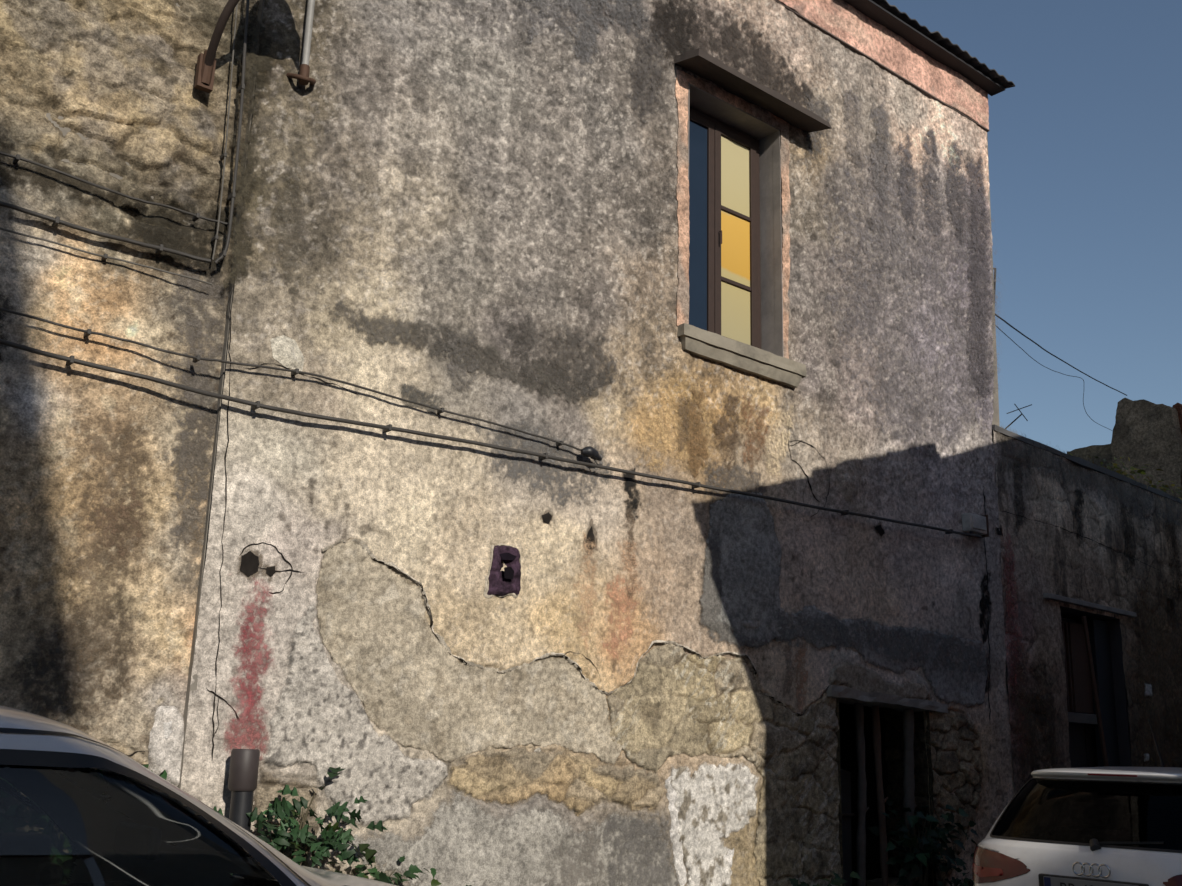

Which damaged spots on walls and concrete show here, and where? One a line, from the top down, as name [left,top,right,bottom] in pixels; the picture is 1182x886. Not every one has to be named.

water stain [0,1,273,593]
water stain [330,300,618,405]
water stain [526,0,999,449]
water stain [14,423,159,721]
rust [226,581,271,760]
spalling [252,767,344,874]
spalling [316,539,845,886]
spalling [924,709,983,886]
water stain [997,426,1182,784]